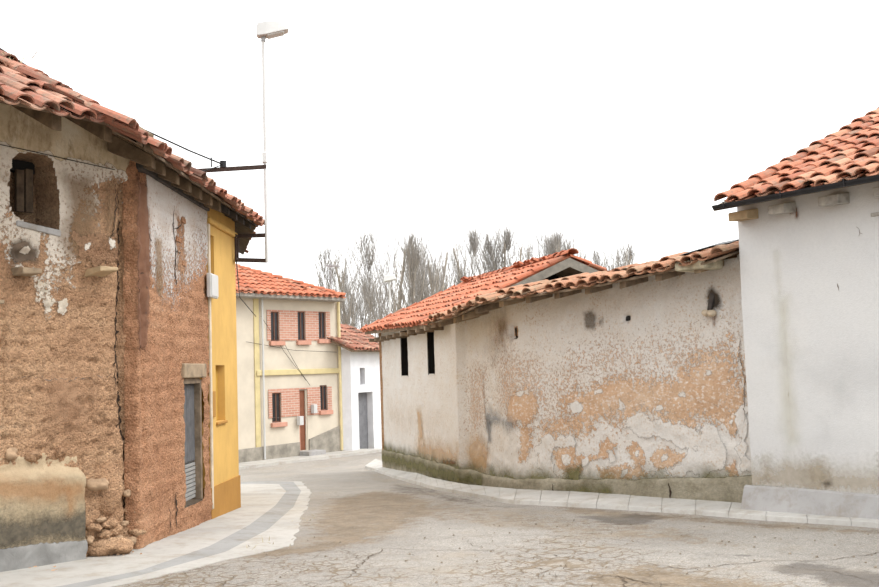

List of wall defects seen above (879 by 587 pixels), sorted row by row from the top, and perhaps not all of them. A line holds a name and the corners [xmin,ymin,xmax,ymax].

flaking render [10,240,38,262]
peeling [35,277,68,320]
crack [17,179,125,460]
flaking render [71,230,119,267]
water stain [137,177,163,349]
crack [173,209,182,284]
flaking render [459,288,752,480]
water stain [752,465,879,490]